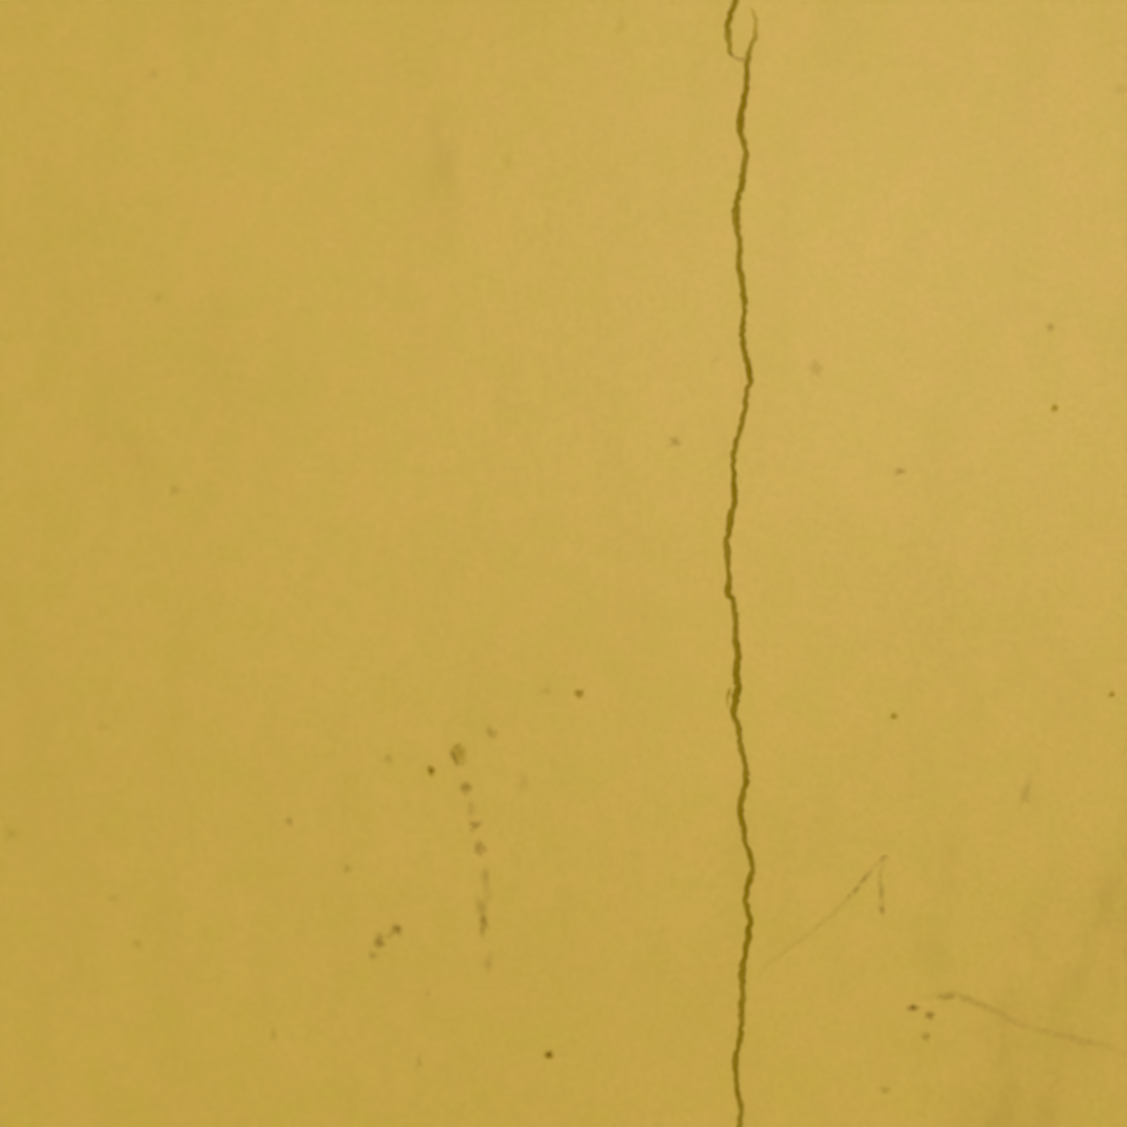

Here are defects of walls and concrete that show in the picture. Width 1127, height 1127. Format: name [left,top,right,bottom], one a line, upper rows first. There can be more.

crack [723,0,758,1127]